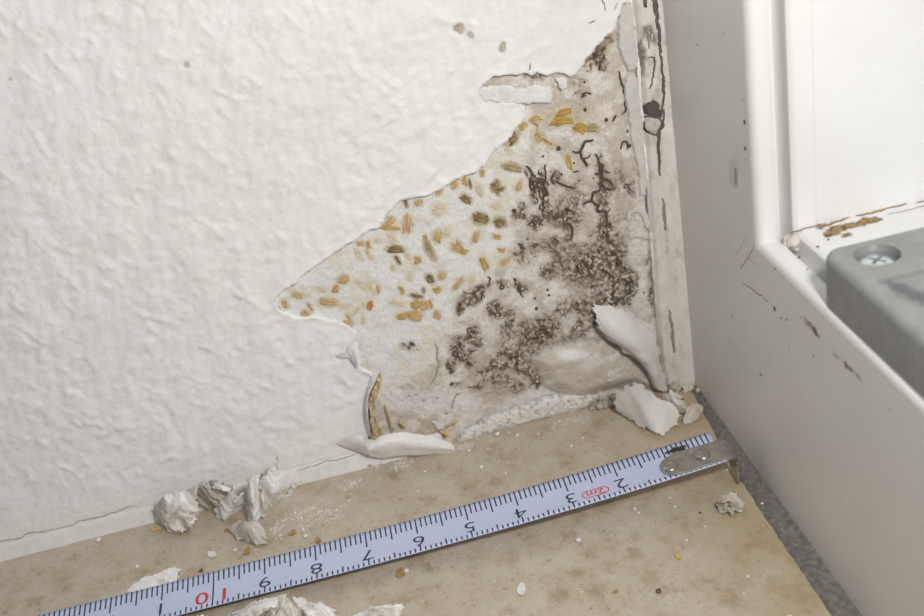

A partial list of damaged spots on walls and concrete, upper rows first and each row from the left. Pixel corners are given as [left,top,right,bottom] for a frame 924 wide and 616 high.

peeling [275,2,668,458]
damp [430,139,654,414]
damp [604,71,627,122]
crack [0,505,138,542]